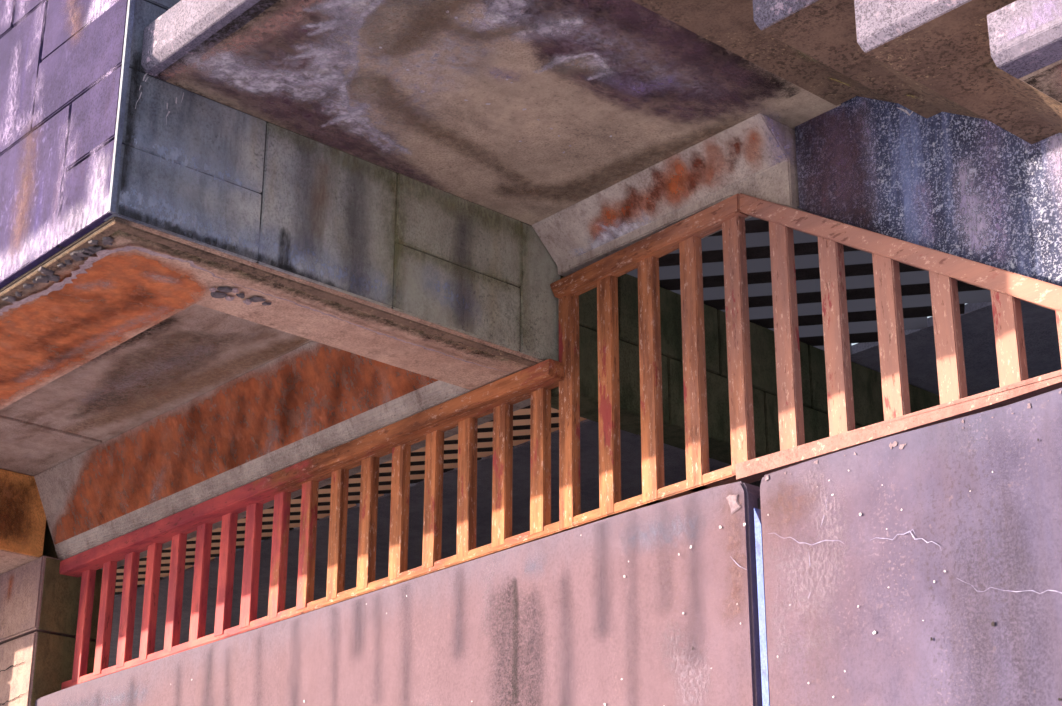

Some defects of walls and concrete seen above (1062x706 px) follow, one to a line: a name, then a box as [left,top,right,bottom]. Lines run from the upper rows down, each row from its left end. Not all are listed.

damp [87,0,115,22]
damp [157,0,794,200]
damp [0,132,259,279]
rust [596,157,705,239]
damp [960,121,1005,250]
rust [0,254,204,400]
damp [128,230,494,356]
rust [54,346,438,544]
rust [0,480,30,538]
damp [493,585,541,706]
crack [871,529,941,549]
crack [957,578,1062,594]